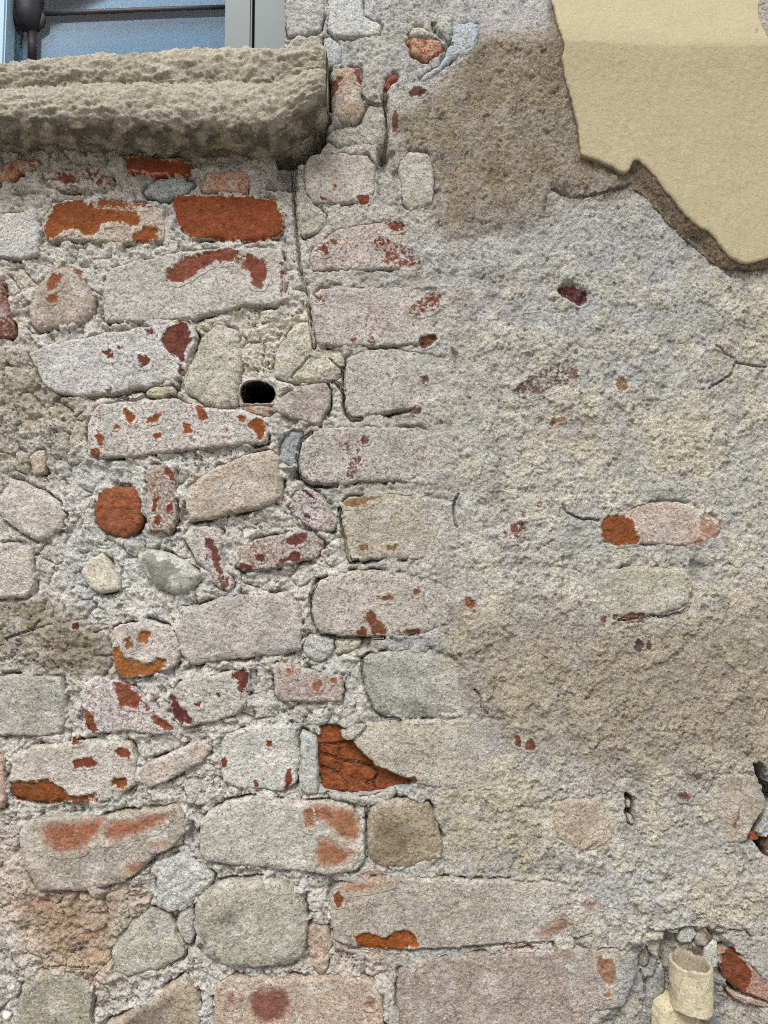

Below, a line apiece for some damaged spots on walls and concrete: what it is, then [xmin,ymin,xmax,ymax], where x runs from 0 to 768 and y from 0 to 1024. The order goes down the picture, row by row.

flaking render [551,0,768,272]
crack [709,345,765,388]
spalling [716,941,753,995]